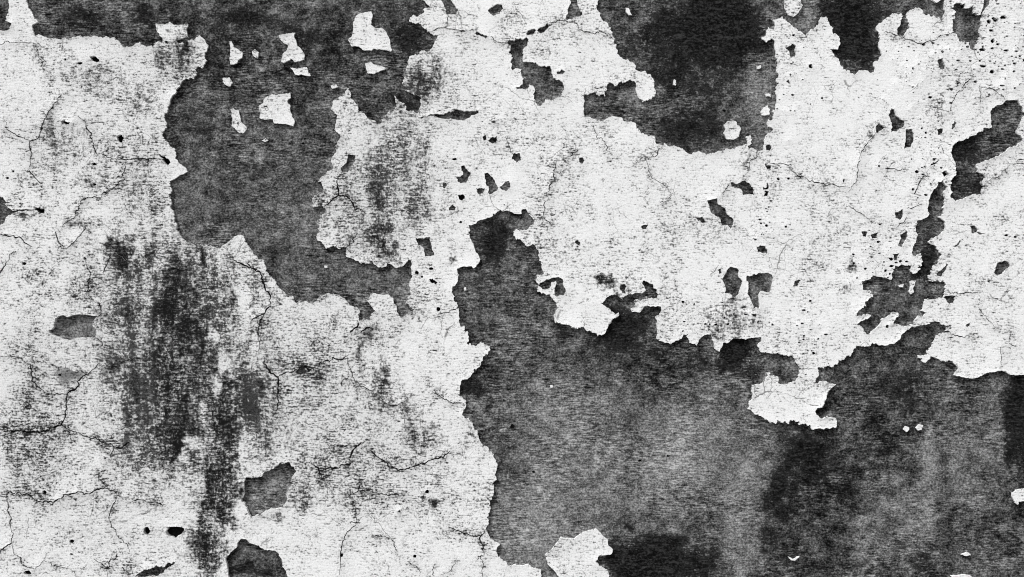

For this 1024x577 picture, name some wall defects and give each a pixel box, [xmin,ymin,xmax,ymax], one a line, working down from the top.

peeling [583,0,836,154]
peeling [836,0,1024,83]
peeling [27,0,479,321]
crack [11,248,147,451]
water stain [101,231,159,468]
water stain [198,244,264,342]
water stain [239,351,292,463]
crack [230,259,410,422]
peeling [443,85,1024,577]
crack [1,479,165,572]
water stain [226,553,274,577]
crack [311,440,453,576]